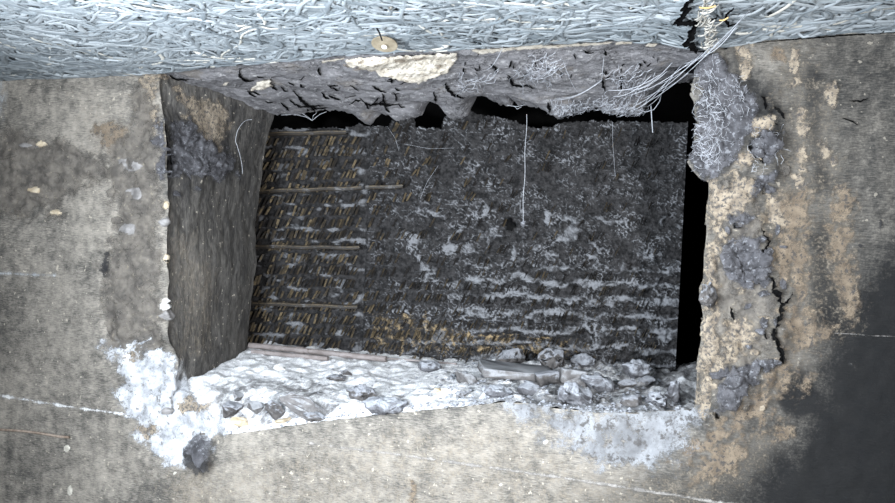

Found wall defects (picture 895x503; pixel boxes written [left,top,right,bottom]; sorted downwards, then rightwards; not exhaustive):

peeling [472,41,632,54]
spalling [322,53,457,85]
spalling [251,80,271,91]
spalling [270,109,392,130]
spalling [414,102,447,129]
spalling [471,81,815,426]
leakage [767,184,861,353]
crack [764,276,793,364]
peeling [176,395,213,414]